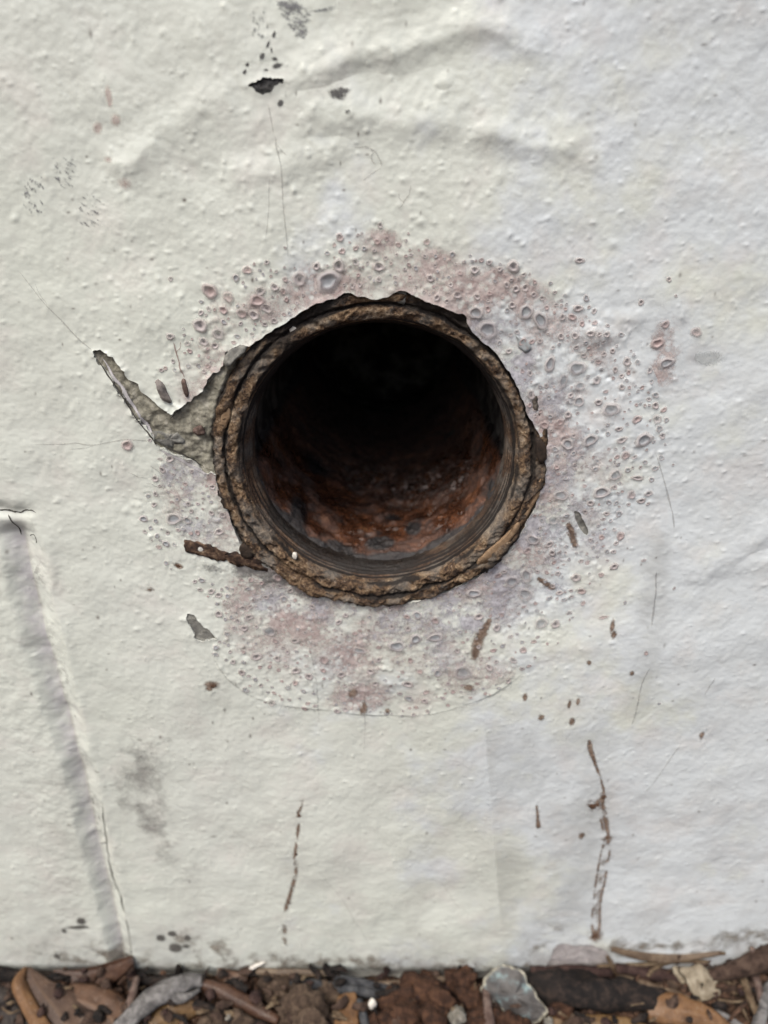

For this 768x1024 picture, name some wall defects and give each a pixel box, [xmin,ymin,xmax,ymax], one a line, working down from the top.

spalling [249,77,284,95]
spalling [94,341,256,475]
corrosion [256,348,503,560]
corrosion [534,437,547,464]
corrosion [476,479,545,565]
spalling [186,614,216,641]
corrosion [471,619,492,660]
corrosion [284,806,302,912]
corrosion [587,740,611,941]